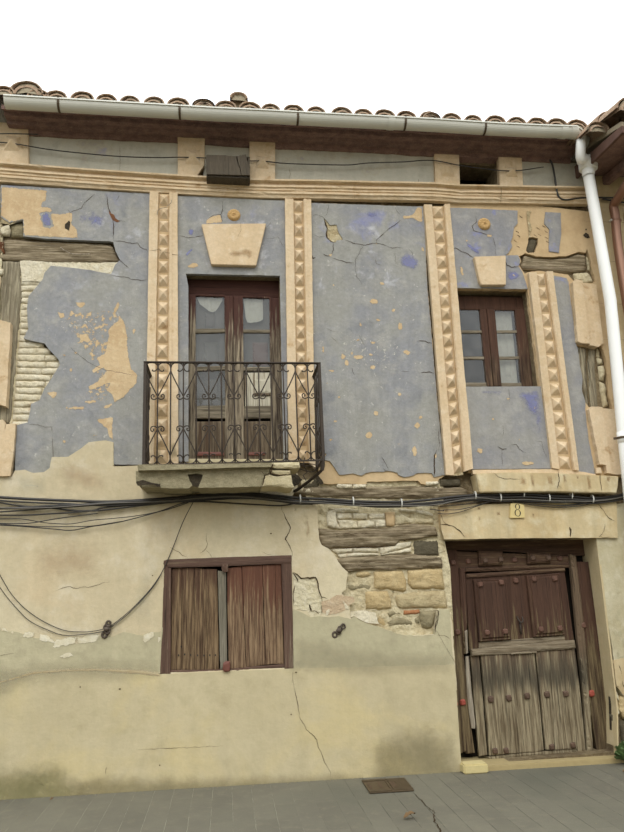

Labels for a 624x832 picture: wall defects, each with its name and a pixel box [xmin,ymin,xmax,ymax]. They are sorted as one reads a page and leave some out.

peeling [0,187,78,238]
crack [312,205,413,279]
flaking render [526,211,537,253]
flaking render [12,260,117,425]
peeling [58,302,137,438]
spalling [293,470,467,636]
peeling [0,628,99,659]